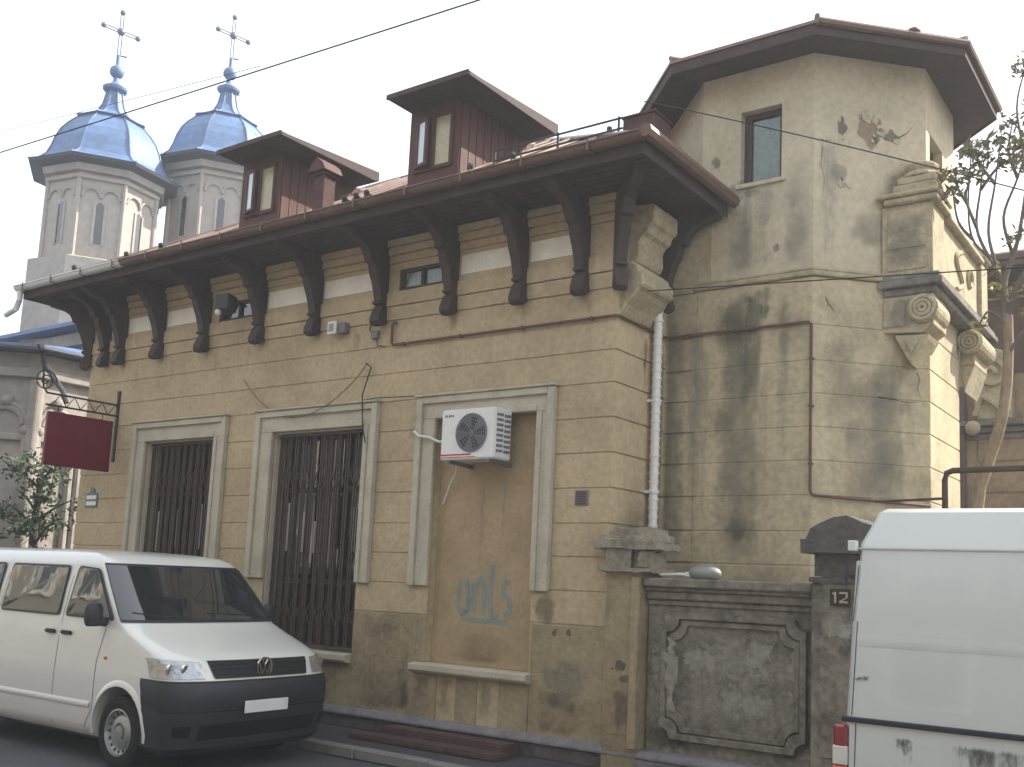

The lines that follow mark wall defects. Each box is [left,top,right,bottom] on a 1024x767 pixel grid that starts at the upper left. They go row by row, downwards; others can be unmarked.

flaking render [648,613,775,722]